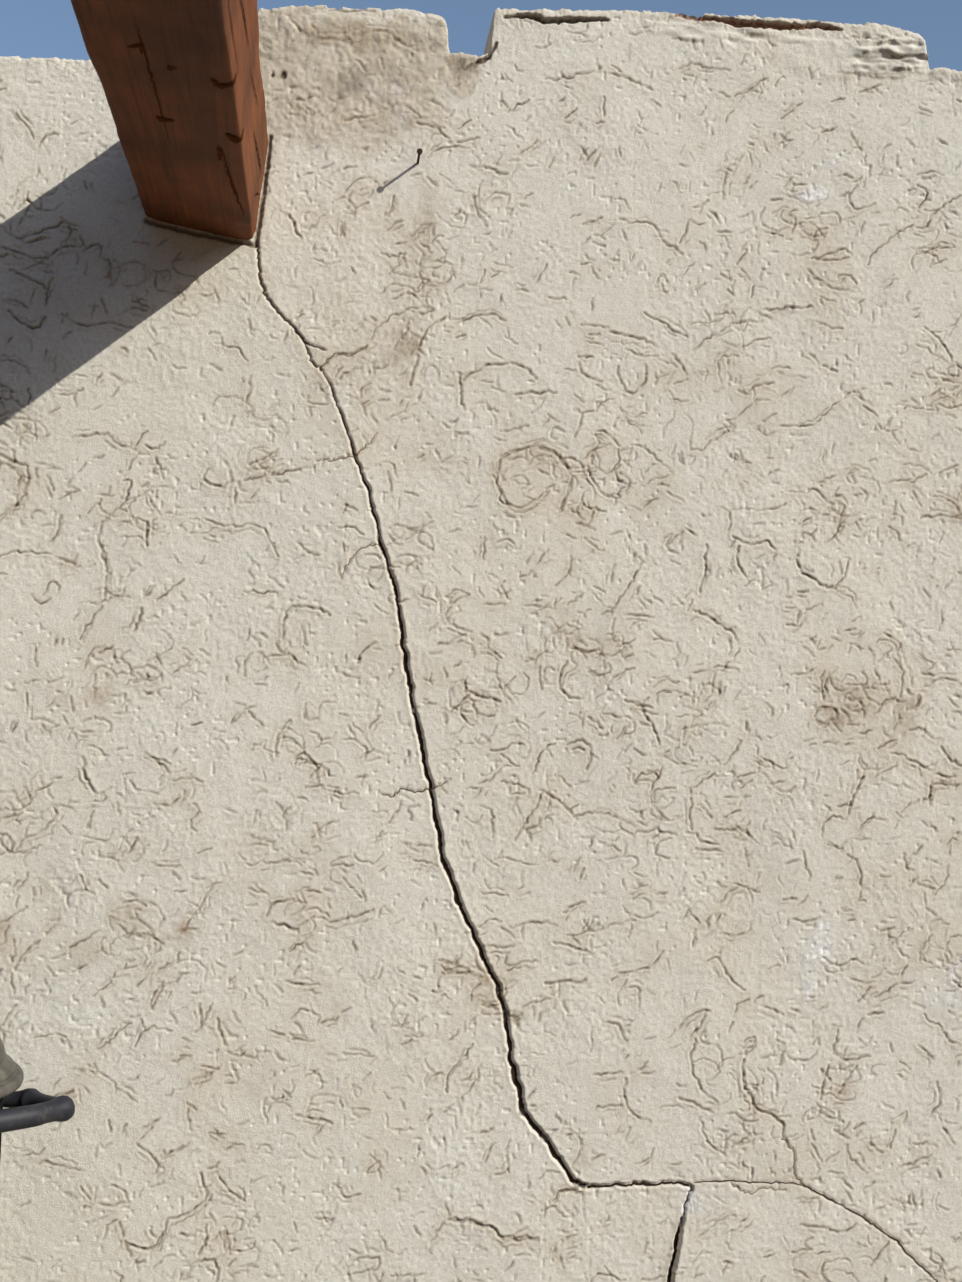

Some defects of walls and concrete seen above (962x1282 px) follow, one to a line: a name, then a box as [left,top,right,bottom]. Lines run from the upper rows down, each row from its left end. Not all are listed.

crack [256,244,938,1282]